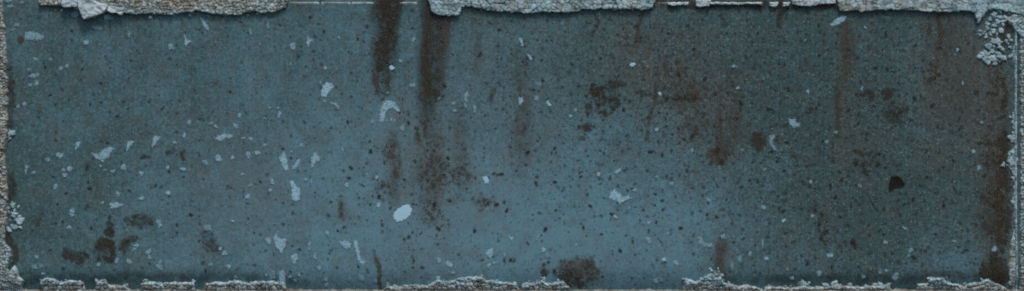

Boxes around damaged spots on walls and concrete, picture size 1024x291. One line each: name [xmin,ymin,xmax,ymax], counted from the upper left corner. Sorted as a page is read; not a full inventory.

spalling [39,0,289,35]
rust [373,0,403,94]
rust [419,0,450,107]
spalling [0,0,44,291]
spalling [428,0,1024,291]
rust [978,68,1012,287]
spalling [32,234,328,291]
spalling [325,229,571,291]
rust [541,256,599,288]